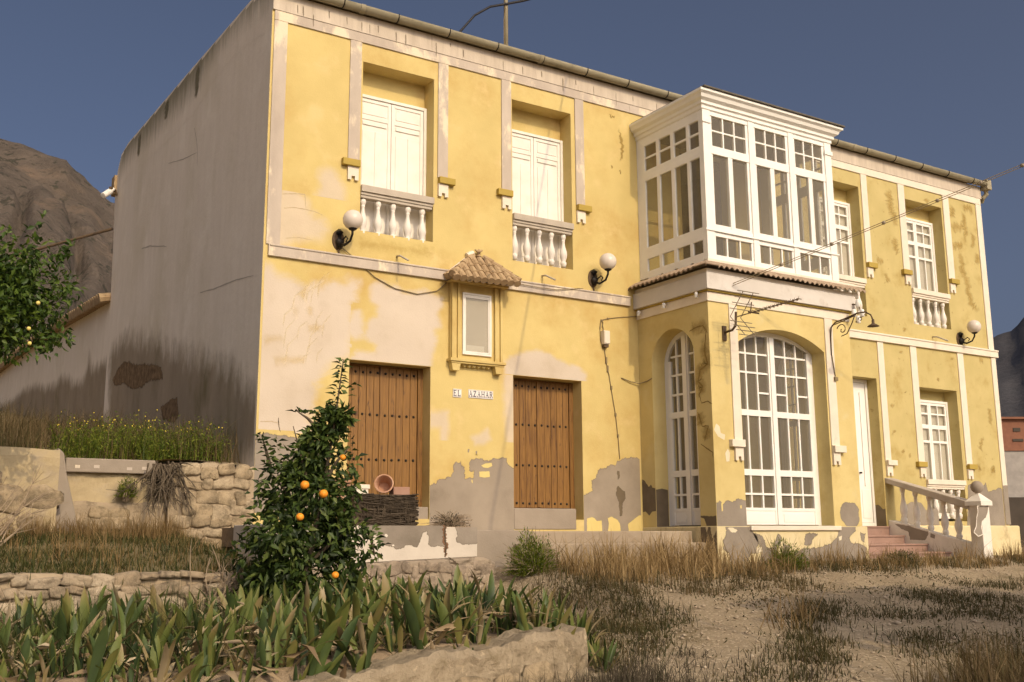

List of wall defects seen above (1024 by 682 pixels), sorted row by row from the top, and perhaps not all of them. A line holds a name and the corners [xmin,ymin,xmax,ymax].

leakage [0,313,257,467]
flaking render [113,361,163,389]
flaking render [161,397,179,424]
peeling [367,345,590,550]
peeling [584,453,642,531]
peeling [716,495,867,563]